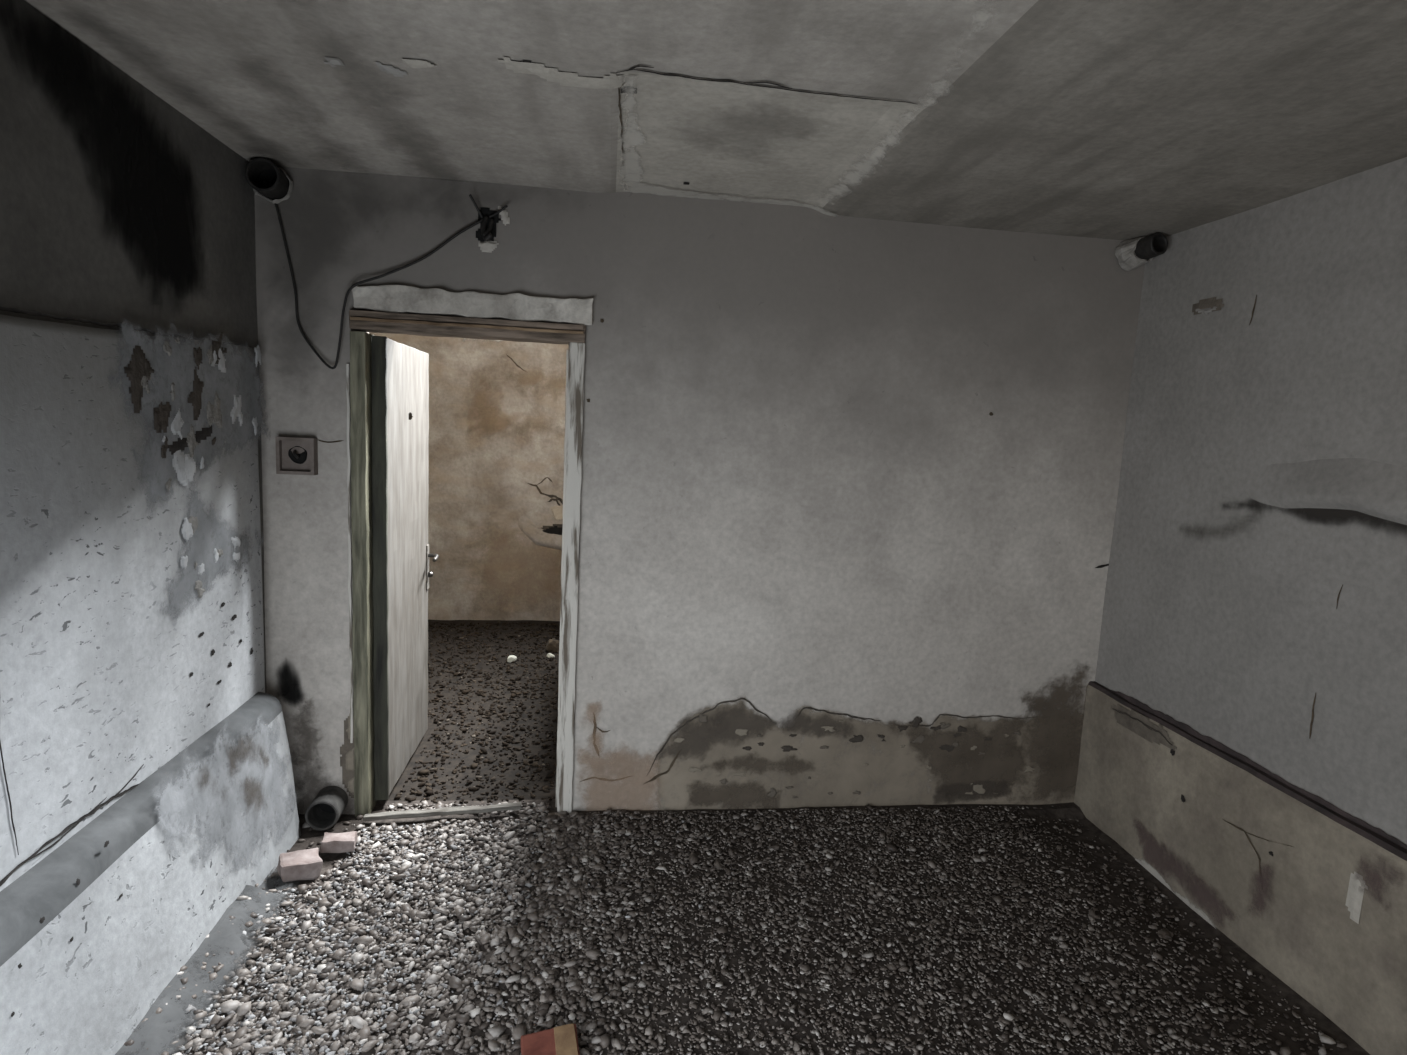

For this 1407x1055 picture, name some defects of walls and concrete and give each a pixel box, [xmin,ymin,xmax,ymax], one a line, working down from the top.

crack [616,65,916,191]
crack [528,477,563,501]
water stain [668,705,851,810]
flaking render [647,698,1075,810]
water stain [889,666,1087,803]